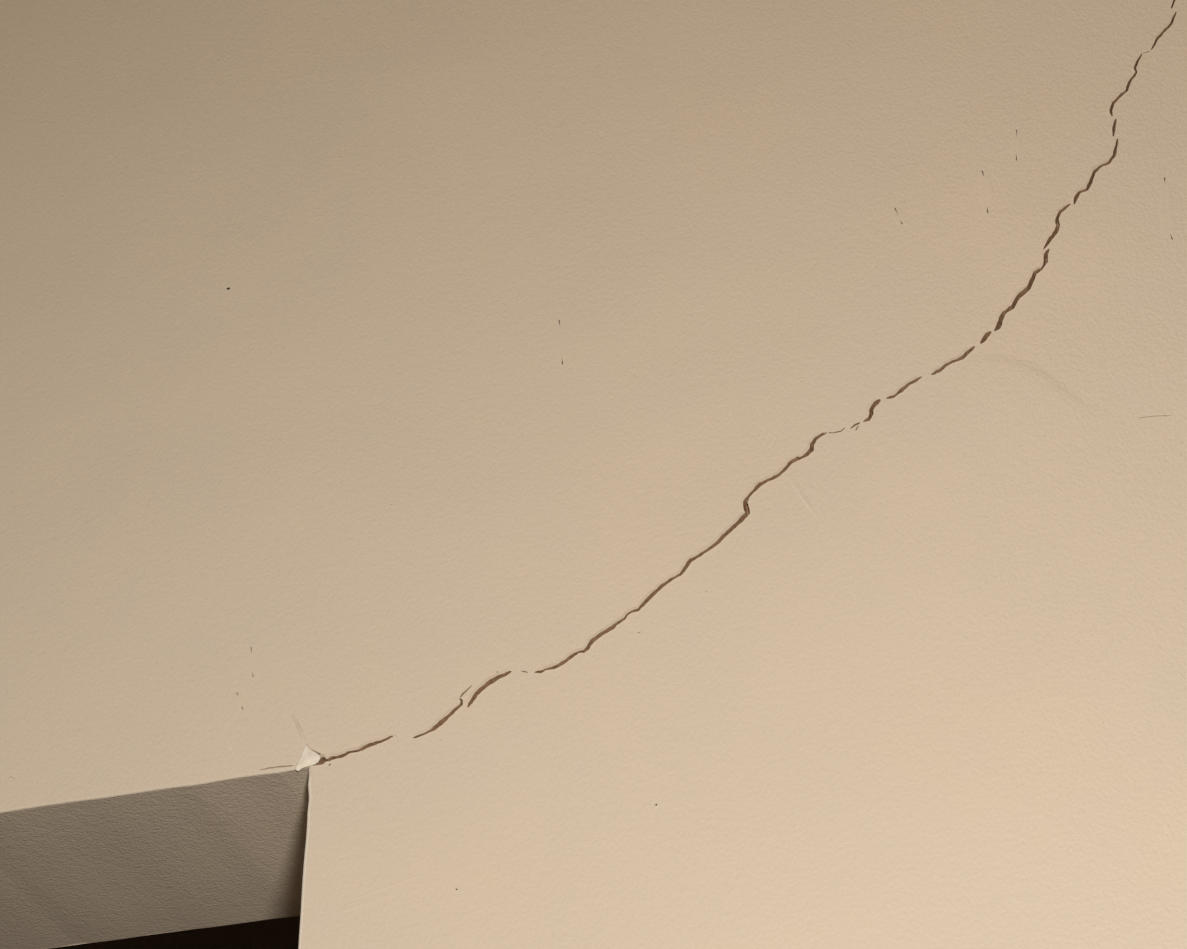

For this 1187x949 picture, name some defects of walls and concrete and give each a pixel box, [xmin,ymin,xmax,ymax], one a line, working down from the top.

crack [261,0,1178,770]